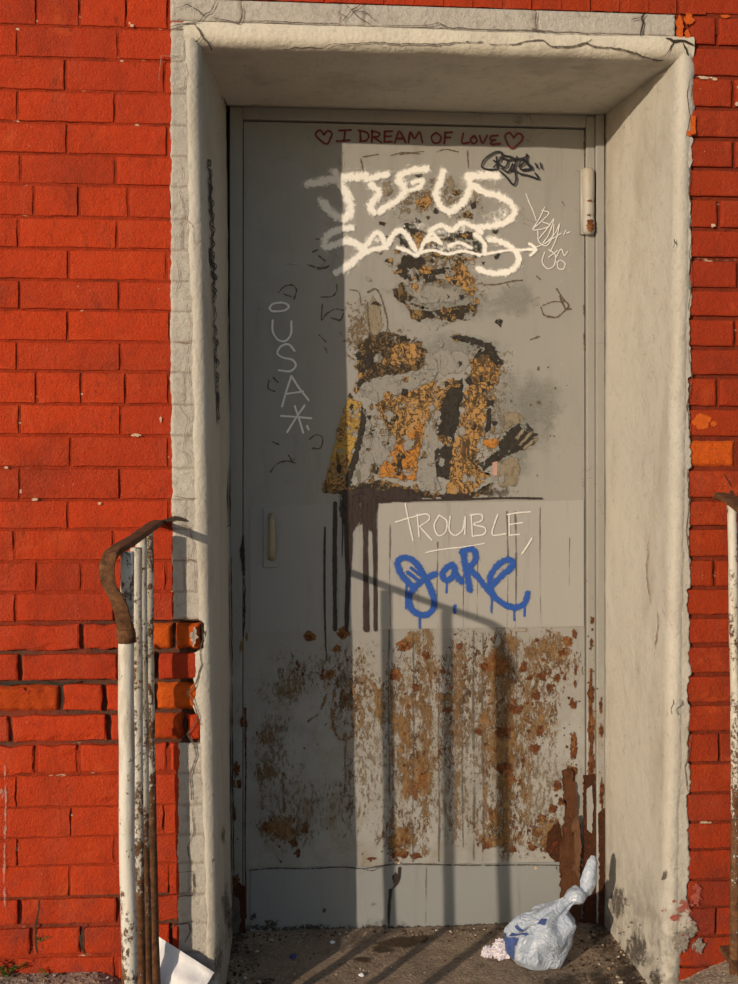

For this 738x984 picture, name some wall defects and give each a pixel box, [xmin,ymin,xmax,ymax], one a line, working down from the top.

crack [170,0,694,62]
crack [673,228,693,308]
peeling [321,284,388,339]
rust [231,617,605,934]
flaking render [661,883,705,954]